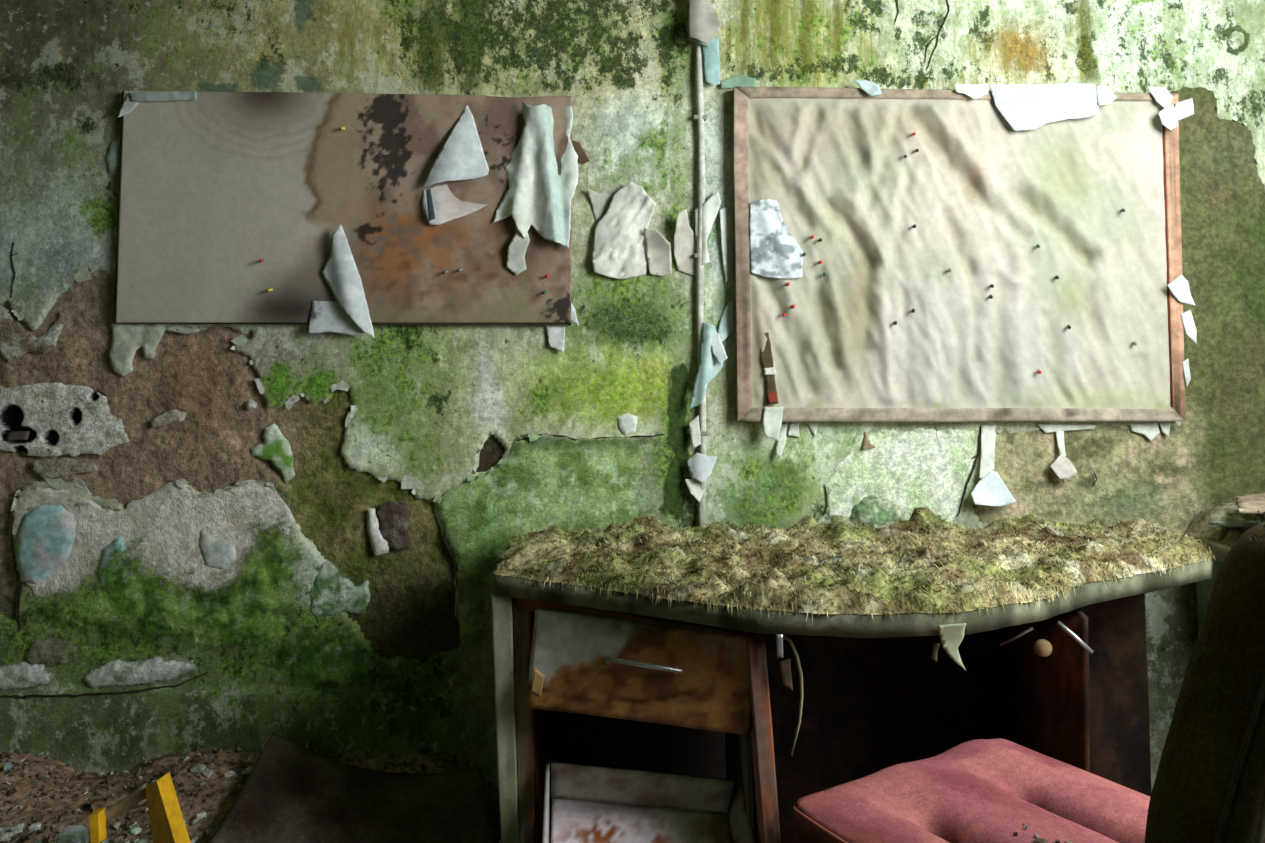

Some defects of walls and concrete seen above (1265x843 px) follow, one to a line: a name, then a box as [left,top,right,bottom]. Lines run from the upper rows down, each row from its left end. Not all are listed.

leakage [295,0,315,32]
leakage [415,0,491,92]
leakage [742,0,750,74]
leakage [1080,0,1096,81]
leakage [1224,25,1250,56]
leakage [199,83,238,92]
leakage [253,61,322,92]
flaking render [971,87,1265,535]
peeling [618,413,638,435]
flaking render [0,265,460,660]
flaking render [472,431,505,475]